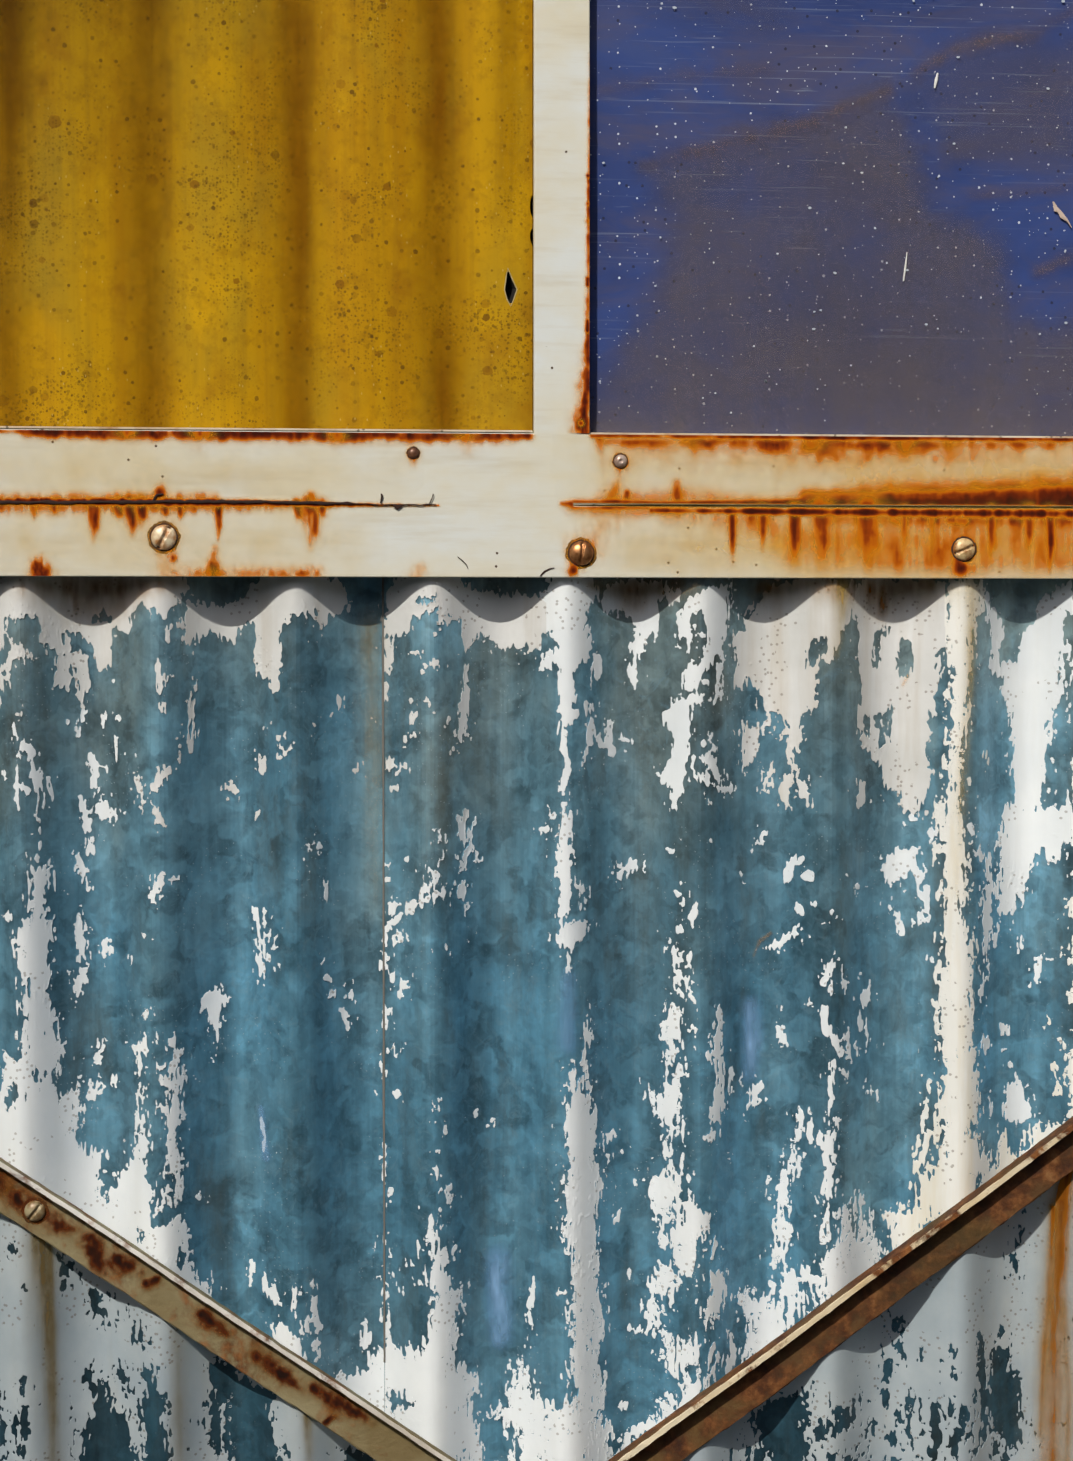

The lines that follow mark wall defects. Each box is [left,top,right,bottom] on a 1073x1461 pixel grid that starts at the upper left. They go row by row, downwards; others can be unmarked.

corrosion [0,485,439,609]
corrosion [0,430,533,462]
corrosion [560,85,1073,613]
peeling [0,576,353,1297]
peeling [321,957,359,1031]
peeling [335,577,1073,1461]
corrosion [0,1172,161,1423]
peeling [0,1252,291,1461]
peeling [246,1259,323,1362]
corrosion [250,1350,368,1429]
peeling [326,1445,373,1461]
corrosion [1041,1171,1073,1461]